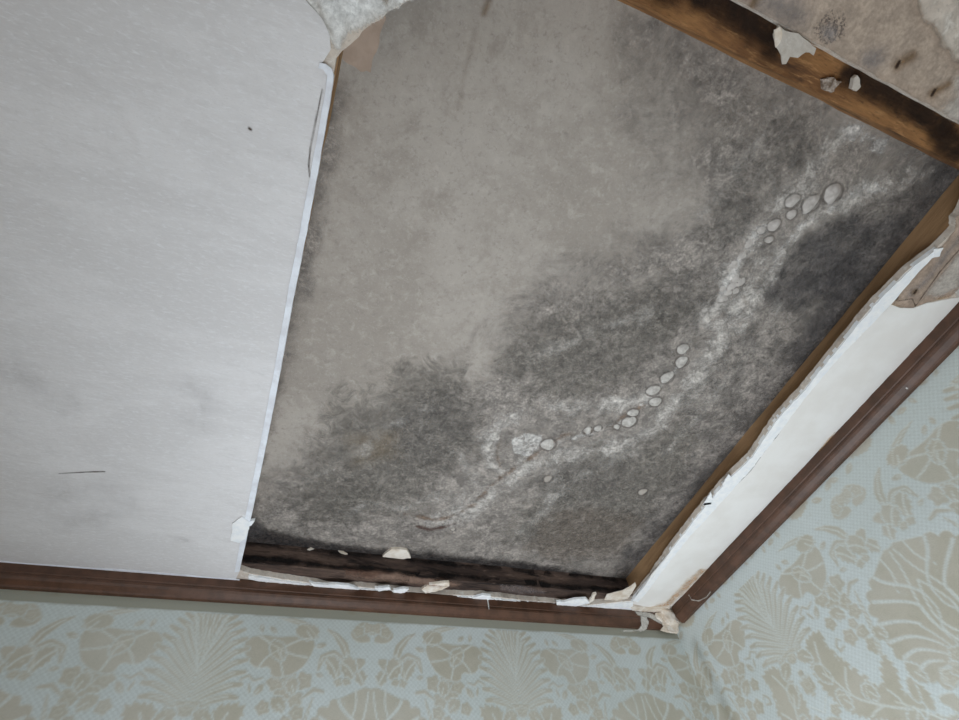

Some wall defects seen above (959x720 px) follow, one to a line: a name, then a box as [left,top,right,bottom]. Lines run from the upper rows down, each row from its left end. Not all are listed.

peeling [307,0,408,49]
peeling [230,63,959,610]
water stain [243,0,959,593]
peeling [773,25,816,64]